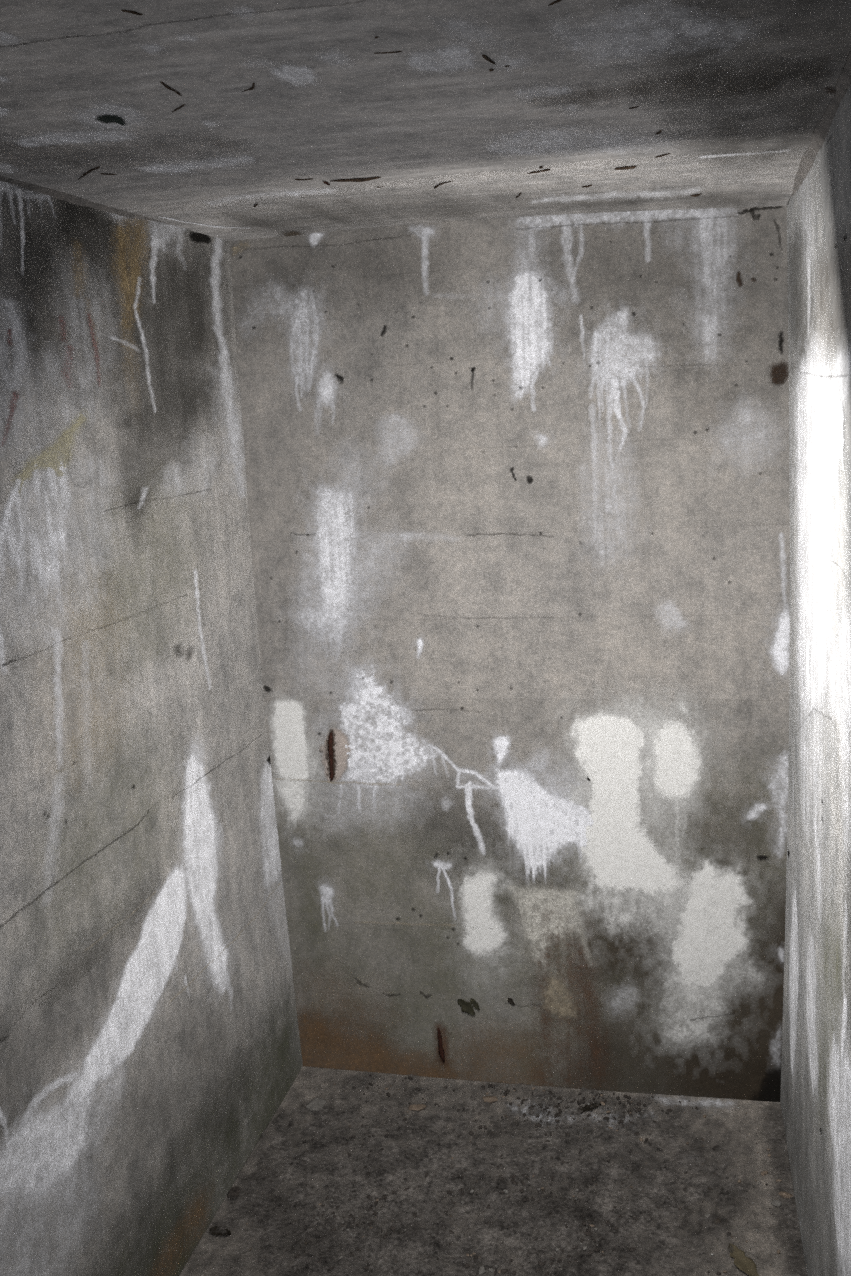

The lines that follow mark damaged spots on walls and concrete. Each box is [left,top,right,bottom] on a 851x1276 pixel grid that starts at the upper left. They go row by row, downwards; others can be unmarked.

efflorescence [518,196,727,290]
damp [134,217,238,445]
damp [291,291,335,407]
efflorescence [507,270,552,398]
damp [581,311,654,446]
damp [0,414,85,583]
damp [770,352,851,759]
efflorescence [260,699,318,884]
corrosion [326,733,334,781]
efflorescence [0,753,229,1197]
corrosion [437,1025,447,1064]
damp [340,665,851,1268]